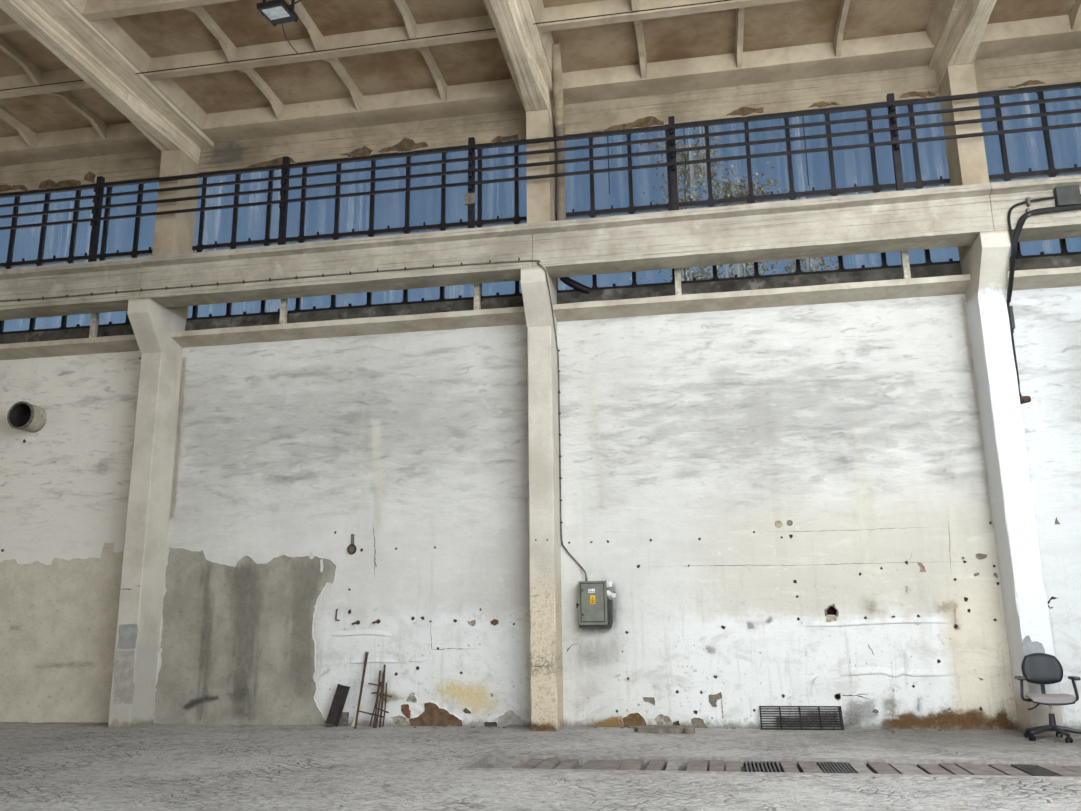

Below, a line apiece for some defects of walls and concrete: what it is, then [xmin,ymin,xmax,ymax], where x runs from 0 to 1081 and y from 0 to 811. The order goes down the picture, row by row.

flaking render [898,90,937,100]
flaking render [592,115,665,132]
flaking render [340,137,429,158]
flaking render [0,171,96,193]
spalling [824,604,839,622]
flaking render [0,541,138,724]
flaking render [153,546,338,725]
damp [191,553,334,724]
flaking render [359,664,523,728]
damp [422,670,504,722]
flaking render [616,696,709,729]
flaking render [700,690,723,708]